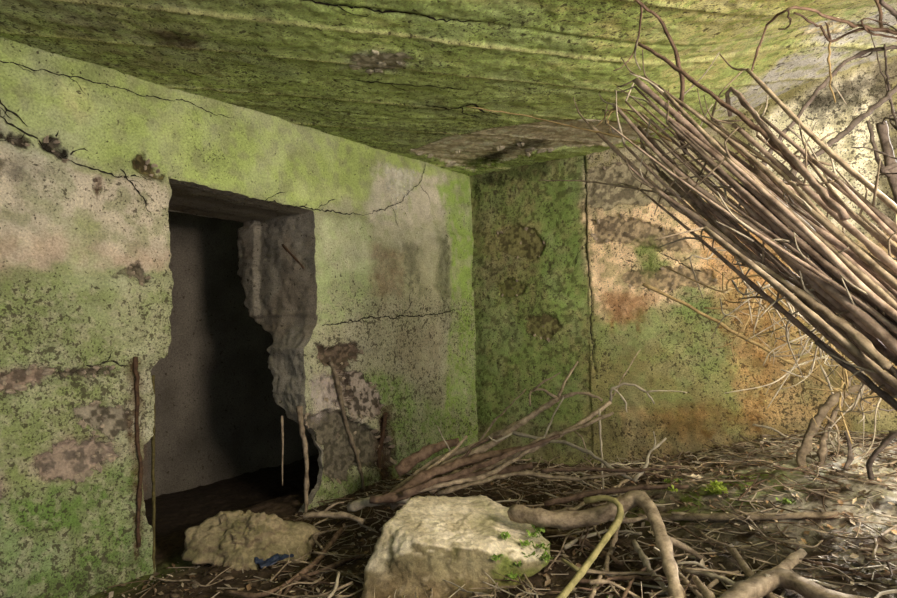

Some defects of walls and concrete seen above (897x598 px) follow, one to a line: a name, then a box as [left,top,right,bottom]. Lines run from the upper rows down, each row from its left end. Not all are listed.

crack [303,0,481,23]
crack [0,61,231,118]
crack [0,99,151,213]
peeling [411,119,654,171]
crack [322,295,461,338]
corrosion [131,357,156,573]
corrosion [376,406,396,480]